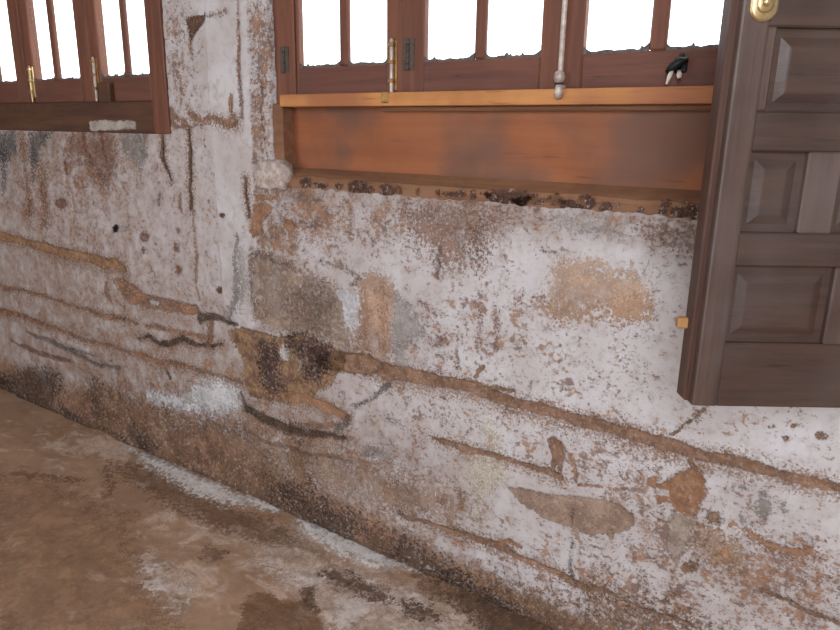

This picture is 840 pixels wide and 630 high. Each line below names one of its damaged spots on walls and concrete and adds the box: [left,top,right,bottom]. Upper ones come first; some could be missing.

crack [0,0,840,503]
flaking render [228,326,384,406]
damp [0,362,724,630]
flaking render [508,486,634,545]
flaking render [647,466,754,574]
damp [754,491,790,520]